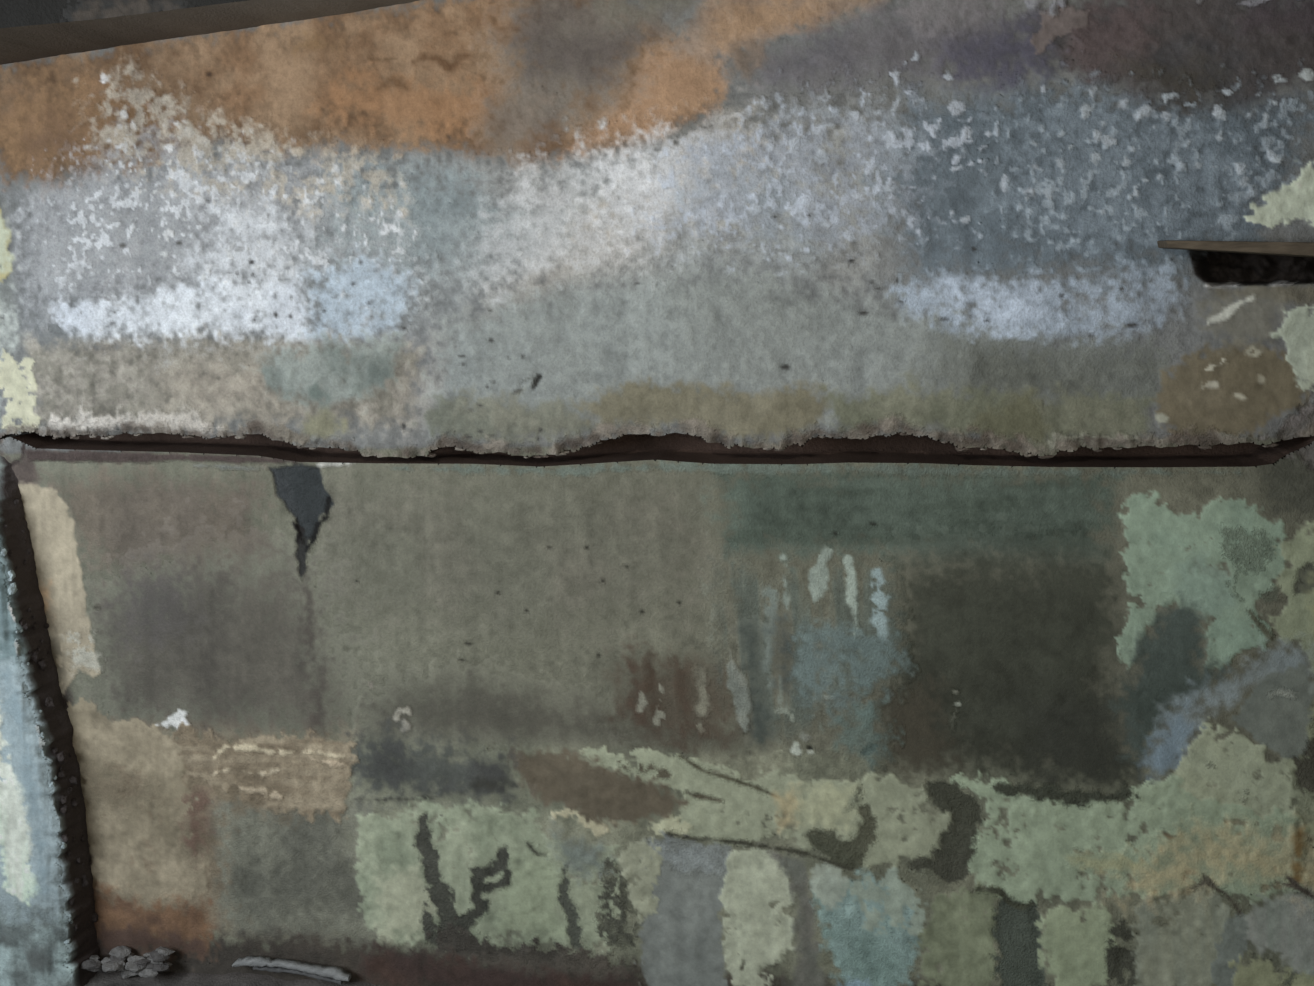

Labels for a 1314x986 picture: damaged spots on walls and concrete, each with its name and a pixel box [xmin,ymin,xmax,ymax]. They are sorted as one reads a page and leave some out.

corrosion [0,0,516,197]
leakage [2,0,1314,480]
corrosion [592,49,733,150]
peeling [1243,157,1314,230]
flaking render [0,347,227,435]
spalling [267,461,337,583]
crack [0,411,1314,468]
peeling [1149,281,1314,478]
leakage [0,562,61,902]
peeling [18,480,1314,986]
leakage [689,512,1314,808]
leakage [0,927,53,976]